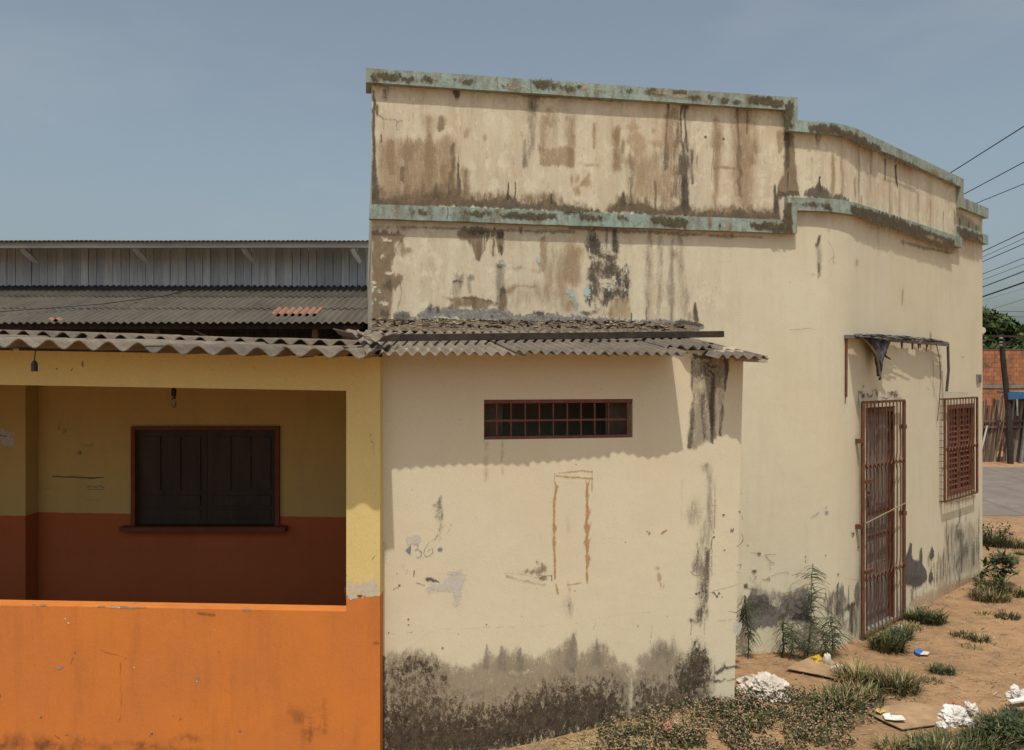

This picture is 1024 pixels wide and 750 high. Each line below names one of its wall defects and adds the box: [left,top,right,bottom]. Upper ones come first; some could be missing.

water stain [371,72,983,320]
flaking render [372,229,410,319]
water stain [687,353,729,448]
peeling [348,581,379,600]
water stain [690,538,713,622]
water stain [824,578,860,641]
water stain [937,495,978,592]
water stain [383,633,737,750]